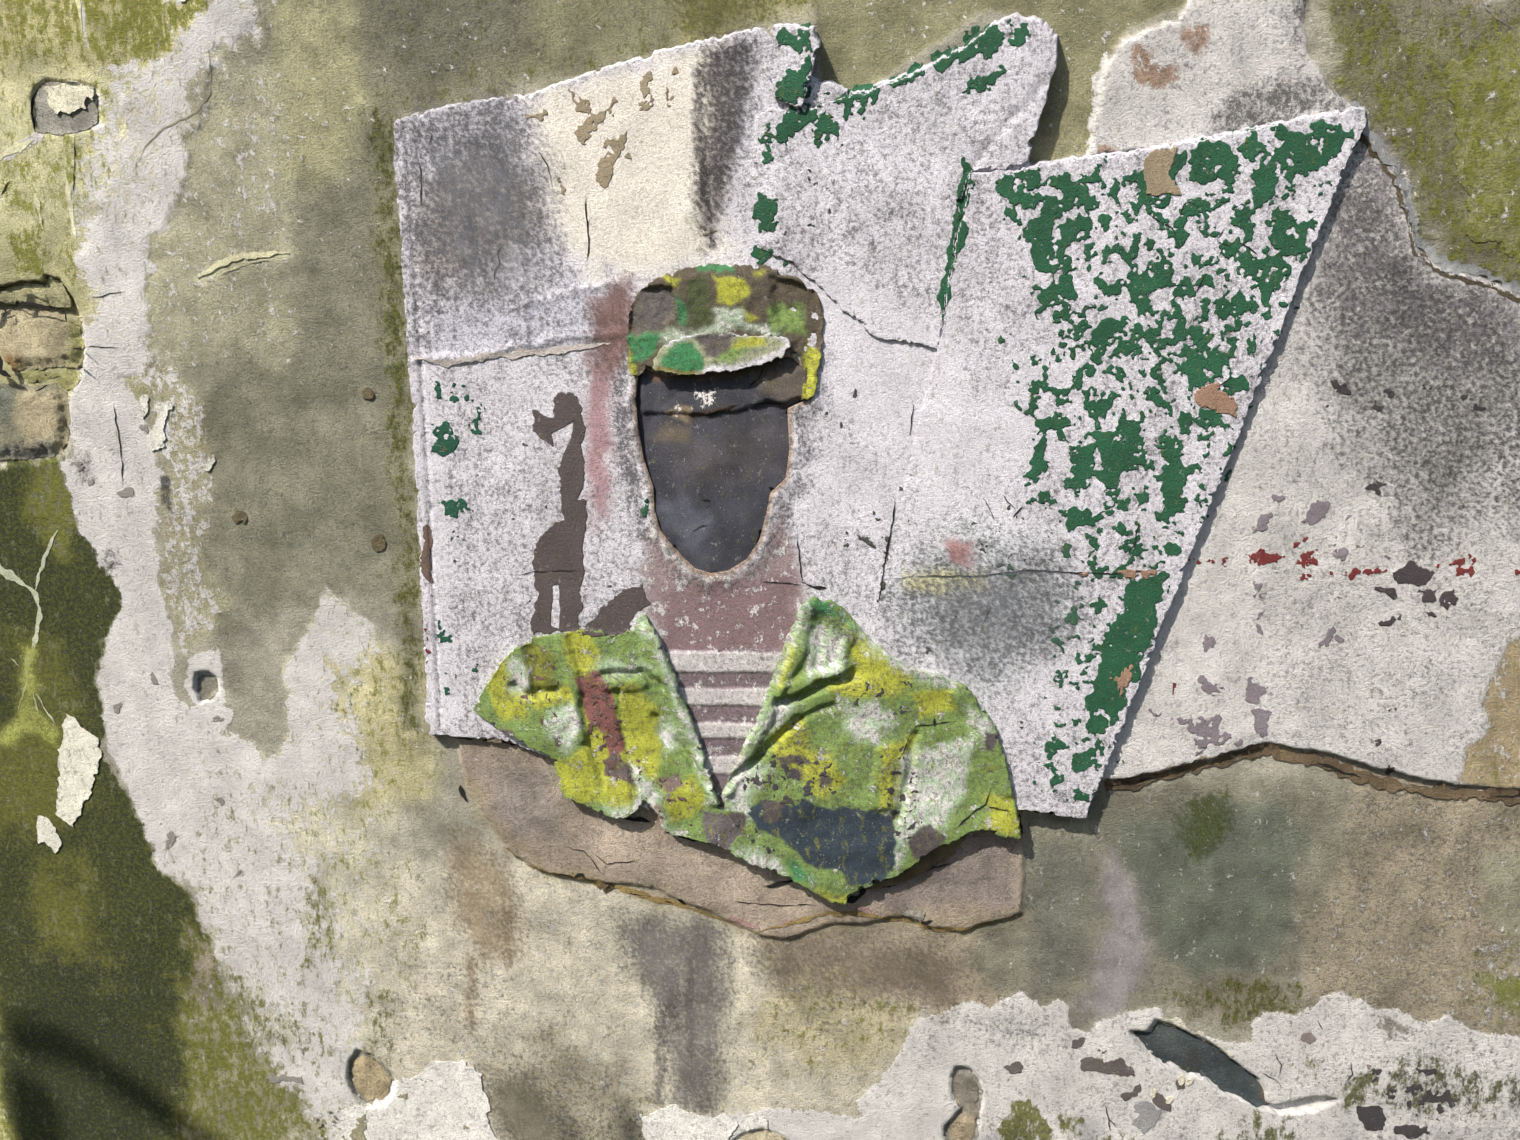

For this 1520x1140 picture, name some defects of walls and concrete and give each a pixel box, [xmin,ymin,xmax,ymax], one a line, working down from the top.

flaking render [34,81,99,136]
peeling [758,18,1031,164]
peeling [751,192,793,266]
peeling [936,156,976,321]
crack [0,281,125,391]
peeling [979,119,1520,836]
crack [0,530,58,723]
water stain [0,646,60,748]
peeling [36,714,102,854]
peeling [639,1104,787,1140]
flaking render [1071,1017,1269,1134]
peeling [1356,1064,1472,1139]